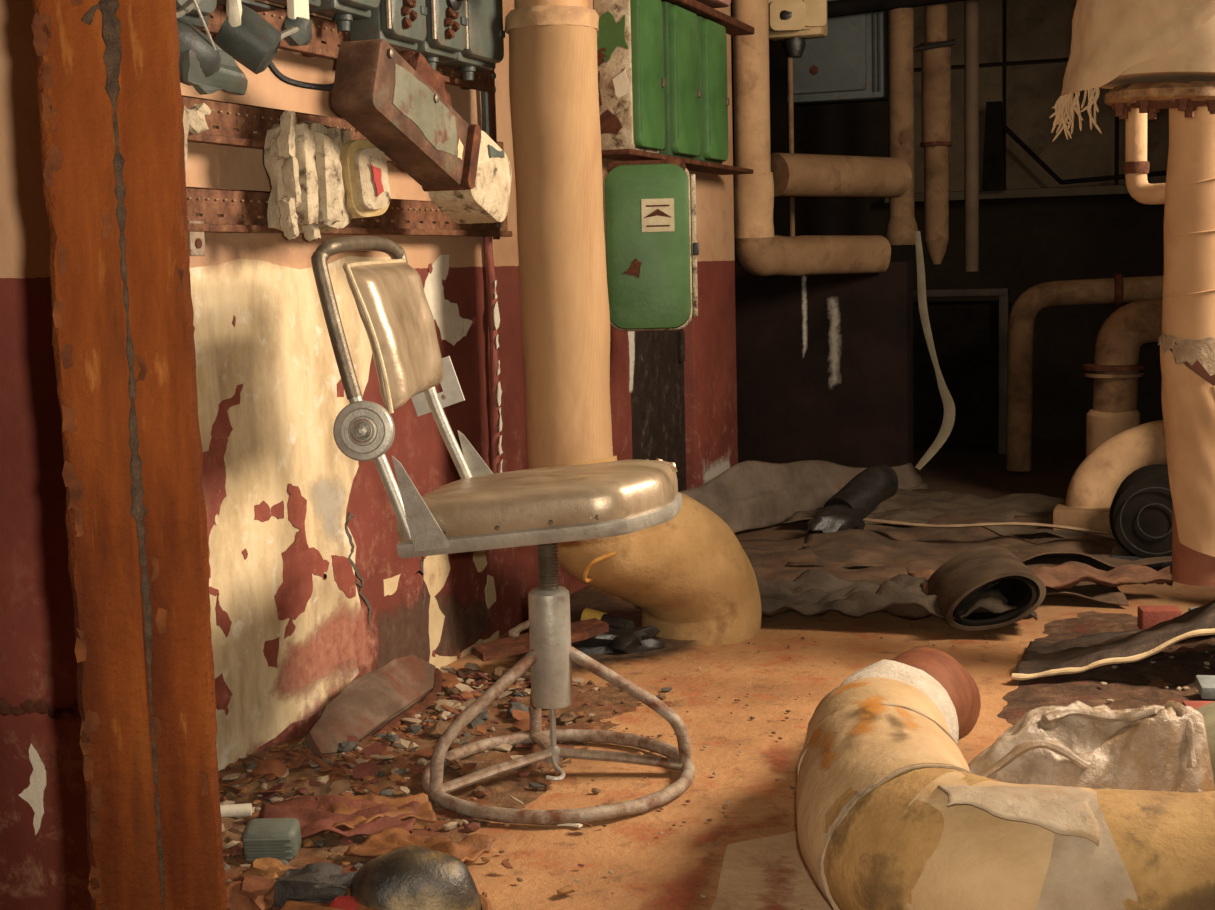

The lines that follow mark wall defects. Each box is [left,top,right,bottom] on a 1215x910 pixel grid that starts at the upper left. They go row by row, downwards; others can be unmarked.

corrosion [31,12,64,188]
corrosion [52,301,64,328]
peeling [424,255,476,346]
corrosion [61,405,77,433]
peeling [494,280,503,473]
corrosion [62,460,84,537]
peeling [189,256,390,771]
corrosion [75,627,87,663]
peeling [383,574,400,596]
peeling [422,550,499,669]
peeling [19,743,46,835]
corrosion [0,697,102,838]